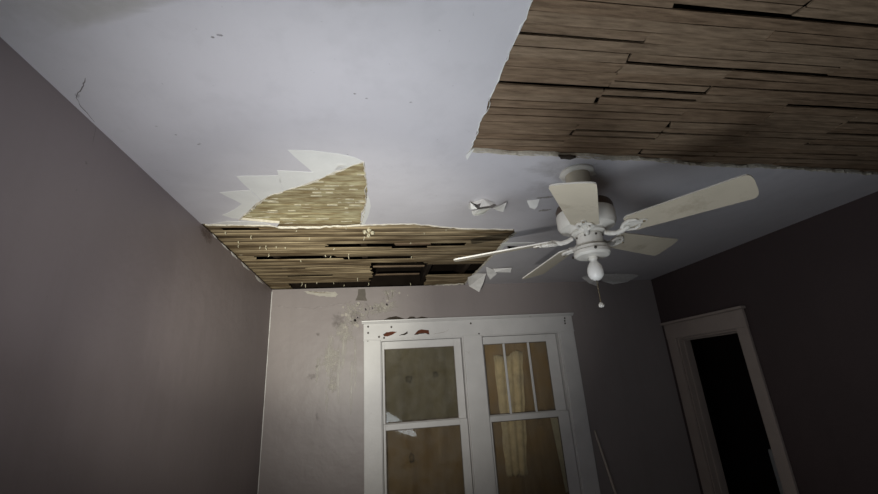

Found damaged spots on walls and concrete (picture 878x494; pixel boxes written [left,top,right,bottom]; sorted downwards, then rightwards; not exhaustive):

peeling [205,150,517,292]